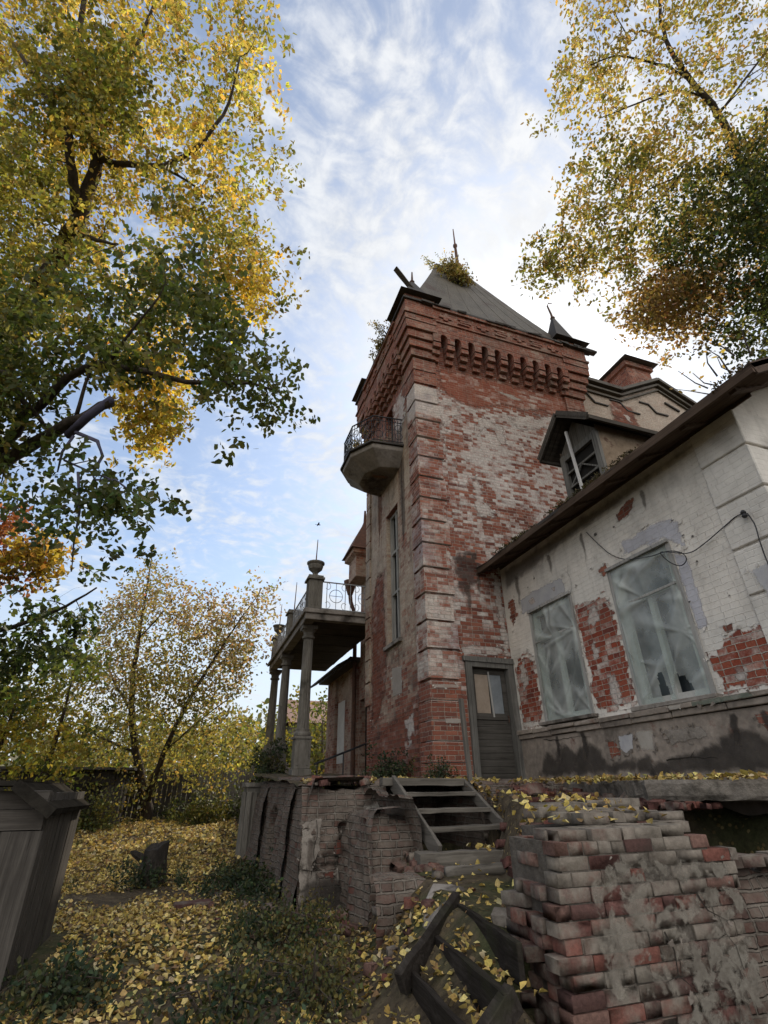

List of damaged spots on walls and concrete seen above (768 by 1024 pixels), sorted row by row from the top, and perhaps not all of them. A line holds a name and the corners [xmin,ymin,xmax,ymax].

spalling [438,369,567,461]
peeling [471,475,498,517]
spalling [612,498,635,528]
spalling [459,573,577,729]
spalling [573,591,639,713]
spalling [674,550,768,694]
leakage [542,711,768,776]
leakage [592,880,701,1000]